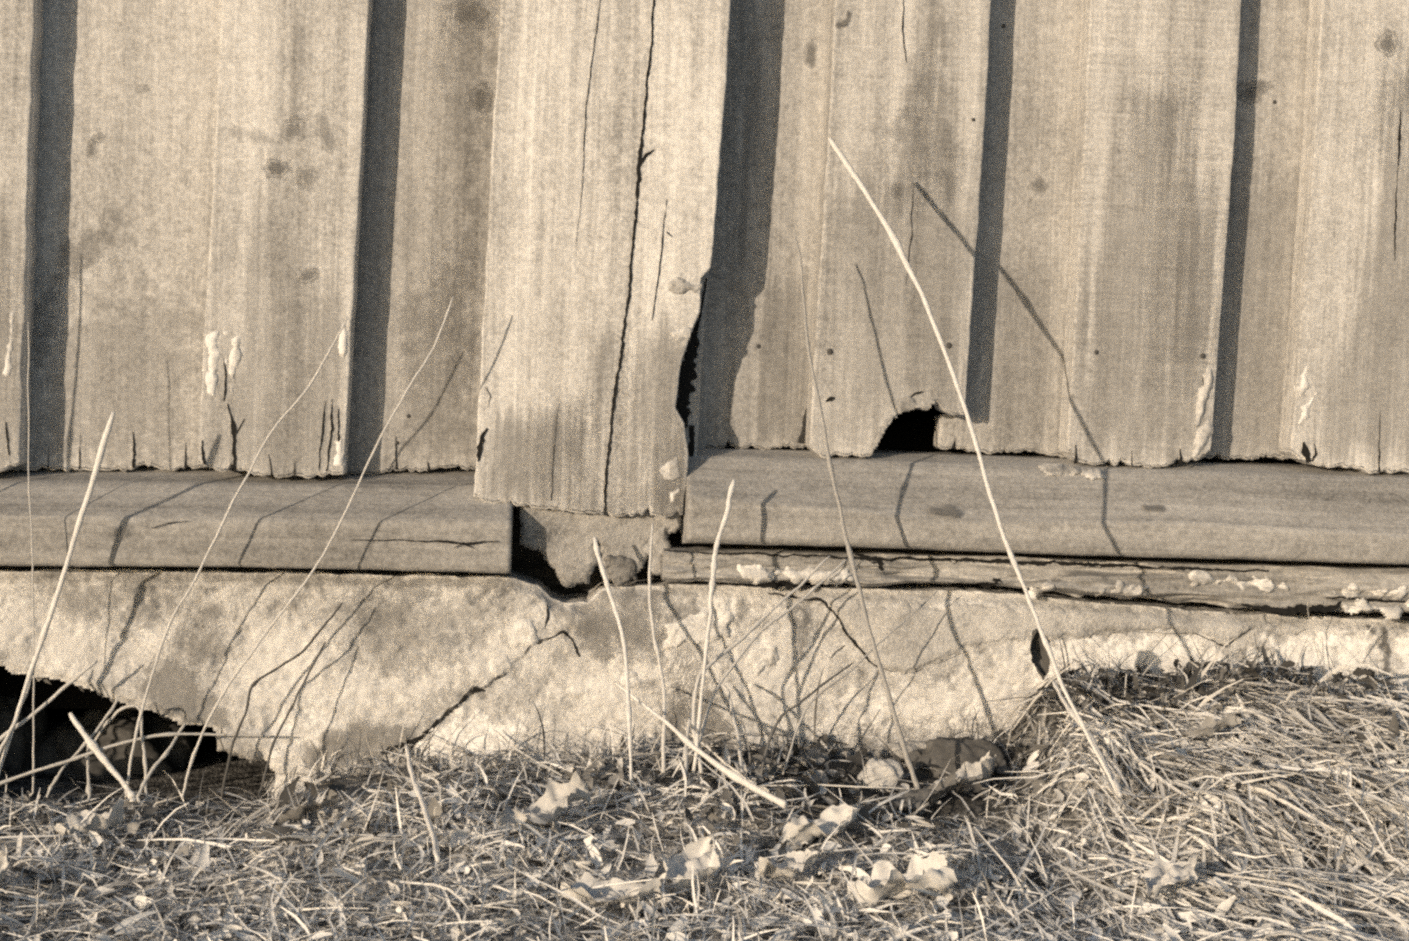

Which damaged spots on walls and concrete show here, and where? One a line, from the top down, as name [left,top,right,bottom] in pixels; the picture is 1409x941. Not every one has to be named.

crack [603,0,672,514]
crack [676,278,707,456]
crack [380,604,580,755]
crack [664,550,1409,673]
spalling [217,736,275,802]